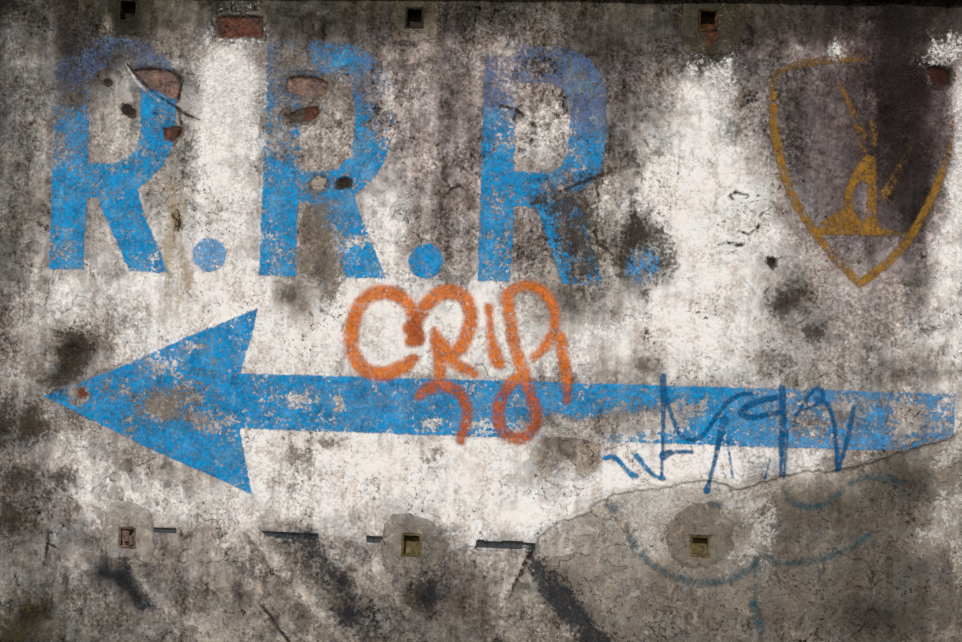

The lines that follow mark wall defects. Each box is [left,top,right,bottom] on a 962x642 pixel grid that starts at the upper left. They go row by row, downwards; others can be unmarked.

flaking render [212,10,267,43]
spalling [120,103,137,118]
flaking render [127,64,184,103]
crack [125,64,199,134]
flaking render [152,112,189,146]
flaking render [278,70,334,128]
flaking render [924,64,956,92]
leakage [928,32,962,328]
flaking render [527,421,962,642]
leakage [525,545,611,642]